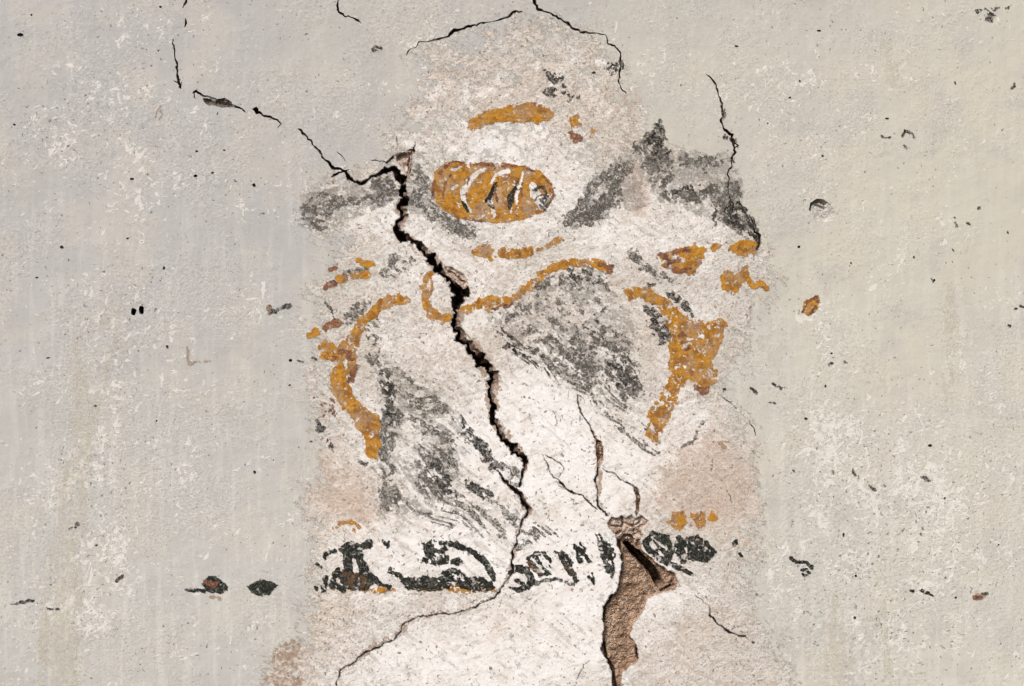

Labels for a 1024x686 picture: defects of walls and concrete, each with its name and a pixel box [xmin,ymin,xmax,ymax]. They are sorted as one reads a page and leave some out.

crack [172,0,640,686]
peeling [260,4,801,686]
crack [706,74,761,249]